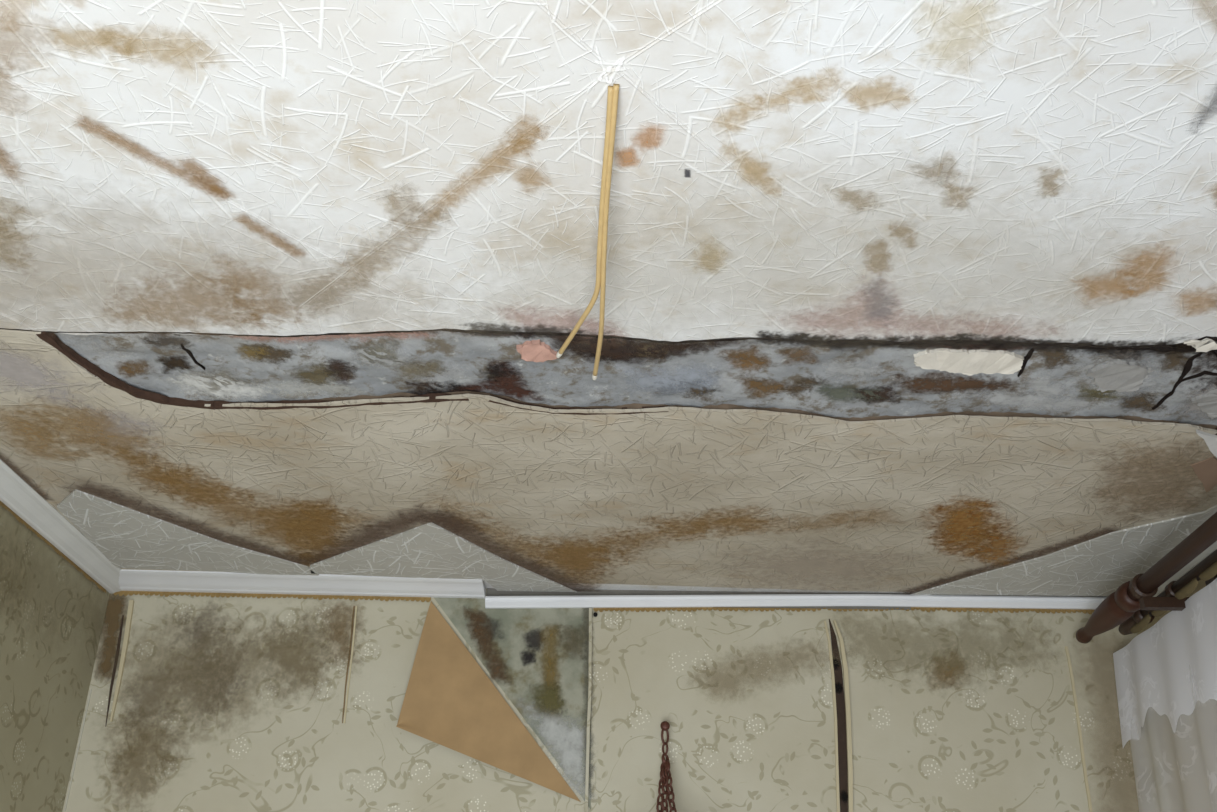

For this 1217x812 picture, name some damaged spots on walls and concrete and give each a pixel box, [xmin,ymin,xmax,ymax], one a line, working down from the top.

damp [83,120,223,194]
damp [5,406,145,464]
damp [153,467,334,559]
peeling [0,324,1217,592]
damp [1097,444,1203,512]
flaking render [434,592,591,810]